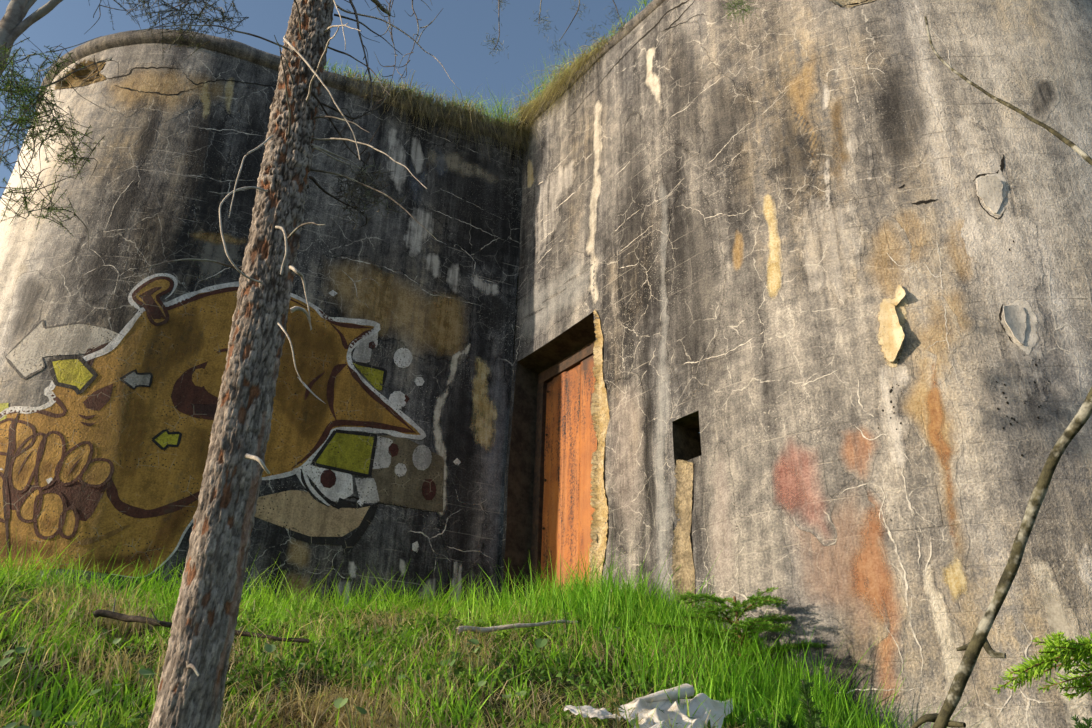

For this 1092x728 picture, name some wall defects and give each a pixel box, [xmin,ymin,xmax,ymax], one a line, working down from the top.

spalling [55,56,106,90]
crack [86,181,147,293]
water stain [101,63,277,286]
crack [104,66,277,95]
water stain [317,98,603,605]
spalling [589,309,611,592]
water stain [605,112,745,612]
crack [669,332,763,374]
corrosion [781,423,907,713]
flaking render [877,285,908,368]
water stain [761,1,1050,402]
corrosion [898,350,969,575]